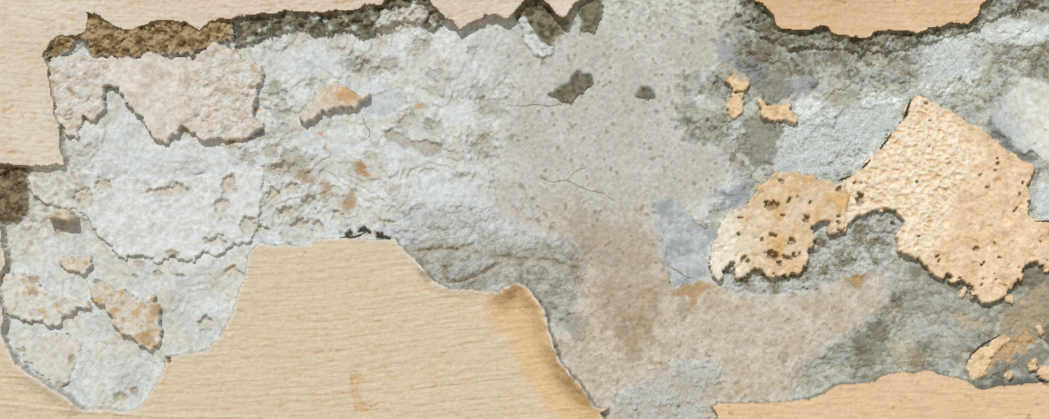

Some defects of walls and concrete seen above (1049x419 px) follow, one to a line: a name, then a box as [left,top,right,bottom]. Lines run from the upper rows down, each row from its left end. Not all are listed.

water stain [921,38,979,84]
water stain [775,104,894,176]
spalling [0,0,588,415]
spalling [465,0,1049,419]
water stain [676,282,709,305]